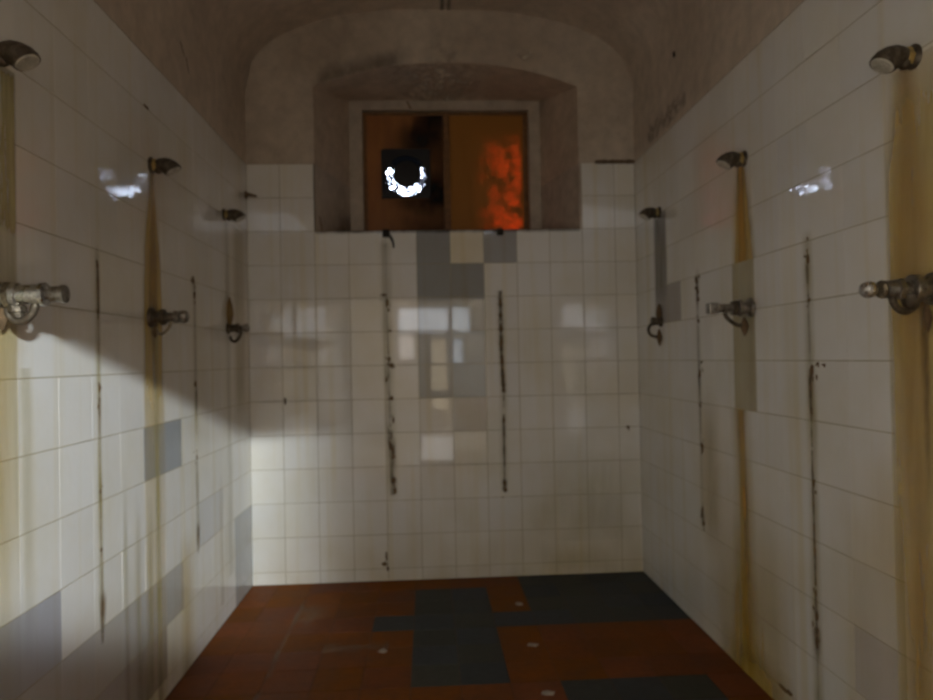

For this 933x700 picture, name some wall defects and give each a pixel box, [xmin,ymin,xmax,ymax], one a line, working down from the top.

corrosion [0,72,15,233]
crack [93,260,101,318]
corrosion [145,186,161,373]
crack [693,275,701,323]
corrosion [736,166,752,263]
corrosion [890,127,933,280]
crack [380,294,397,494]
crack [498,291,507,498]
corrosion [739,409,766,692]
crack [809,362,826,649]
corrosion [894,299,933,563]